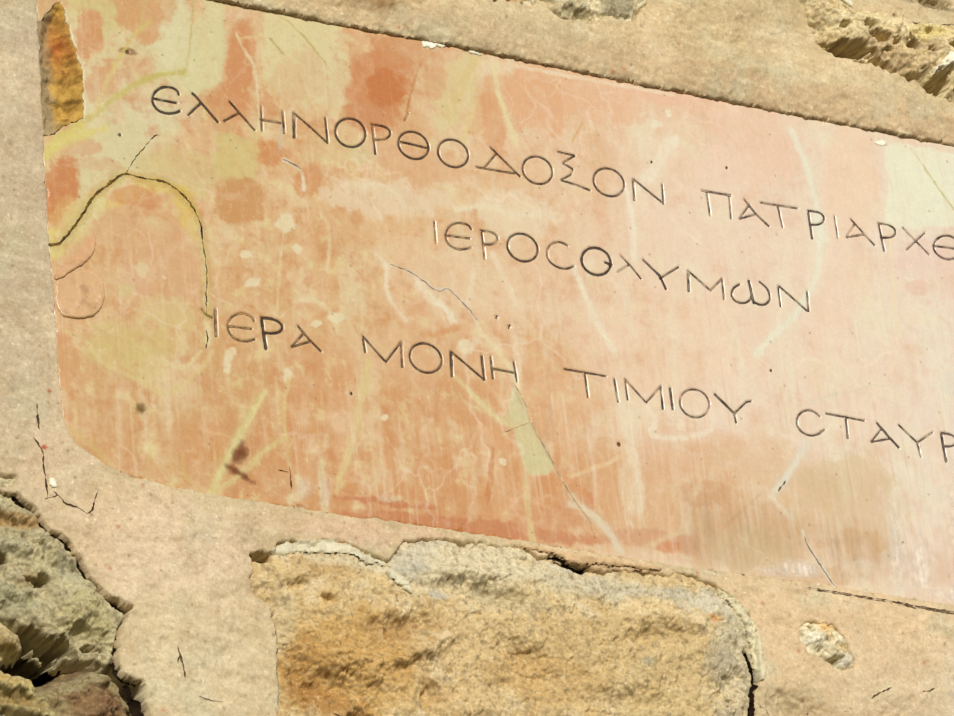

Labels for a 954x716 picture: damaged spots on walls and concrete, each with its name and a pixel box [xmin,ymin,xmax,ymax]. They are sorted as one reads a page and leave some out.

crack [48,135,209,348]
crack [390,264,477,319]
crack [11,404,97,580]
crack [503,385,596,542]
crack [547,557,648,575]
crack [110,636,144,716]
crack [743,653,769,716]